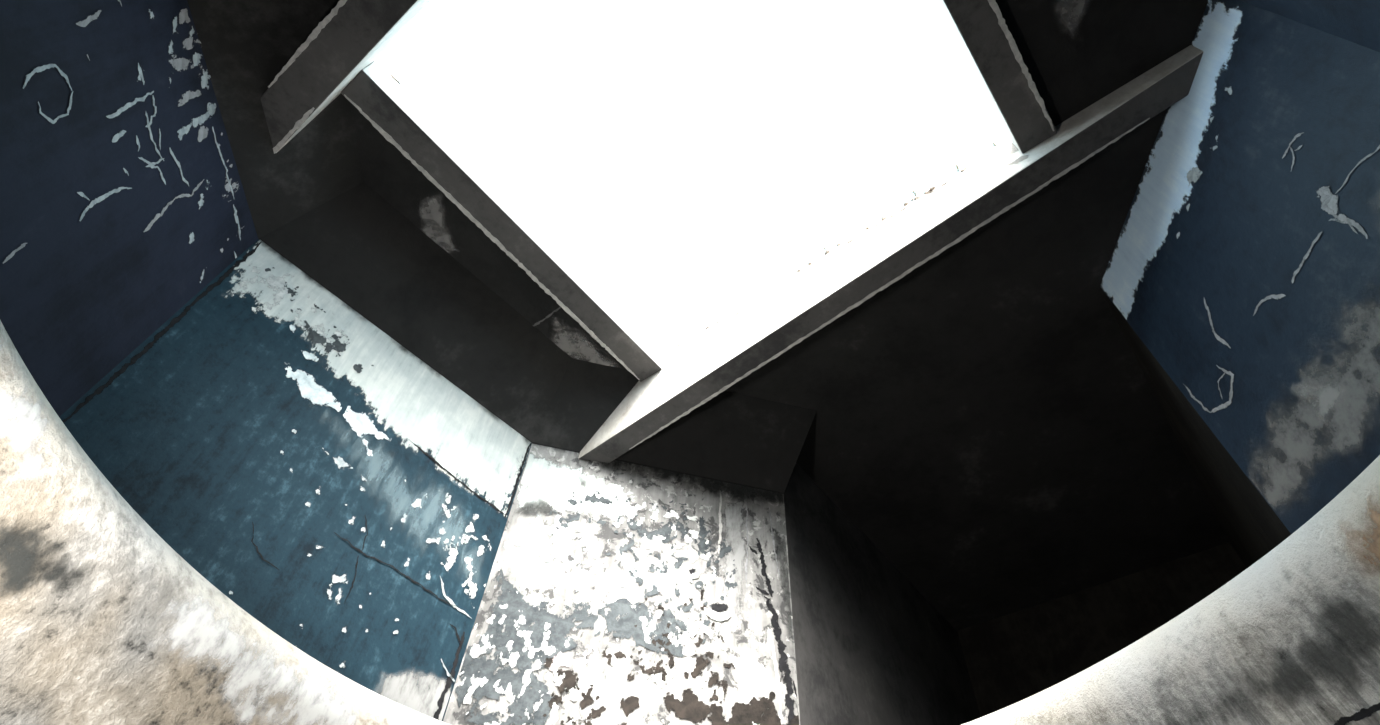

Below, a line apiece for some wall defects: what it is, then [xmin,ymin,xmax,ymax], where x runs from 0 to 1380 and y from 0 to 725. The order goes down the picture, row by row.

peeling [168,8,240,209]
peeling [629,0,1243,450]
crack [1329,145,1380,234]
peeling [225,240,799,725]
crack [718,491,797,725]
crack [1334,703,1380,725]